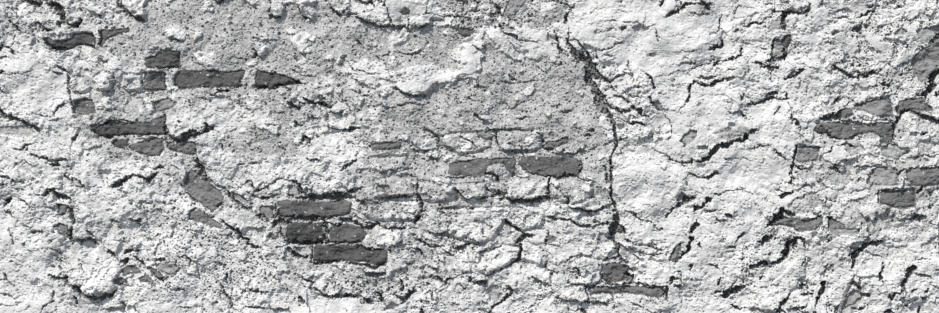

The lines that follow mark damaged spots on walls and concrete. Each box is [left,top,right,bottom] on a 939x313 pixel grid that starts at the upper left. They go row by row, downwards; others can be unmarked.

crack [268,0,282,20]
crack [717,5,742,32]
crack [66,74,80,168]
spalling [0,0,746,313]
crack [415,181,424,213]
crack [545,0,707,265]
peeling [665,21,939,313]
crack [769,71,847,194]
crack [0,227,26,286]
crack [435,228,559,313]
crack [577,286,590,313]
crack [857,262,890,293]